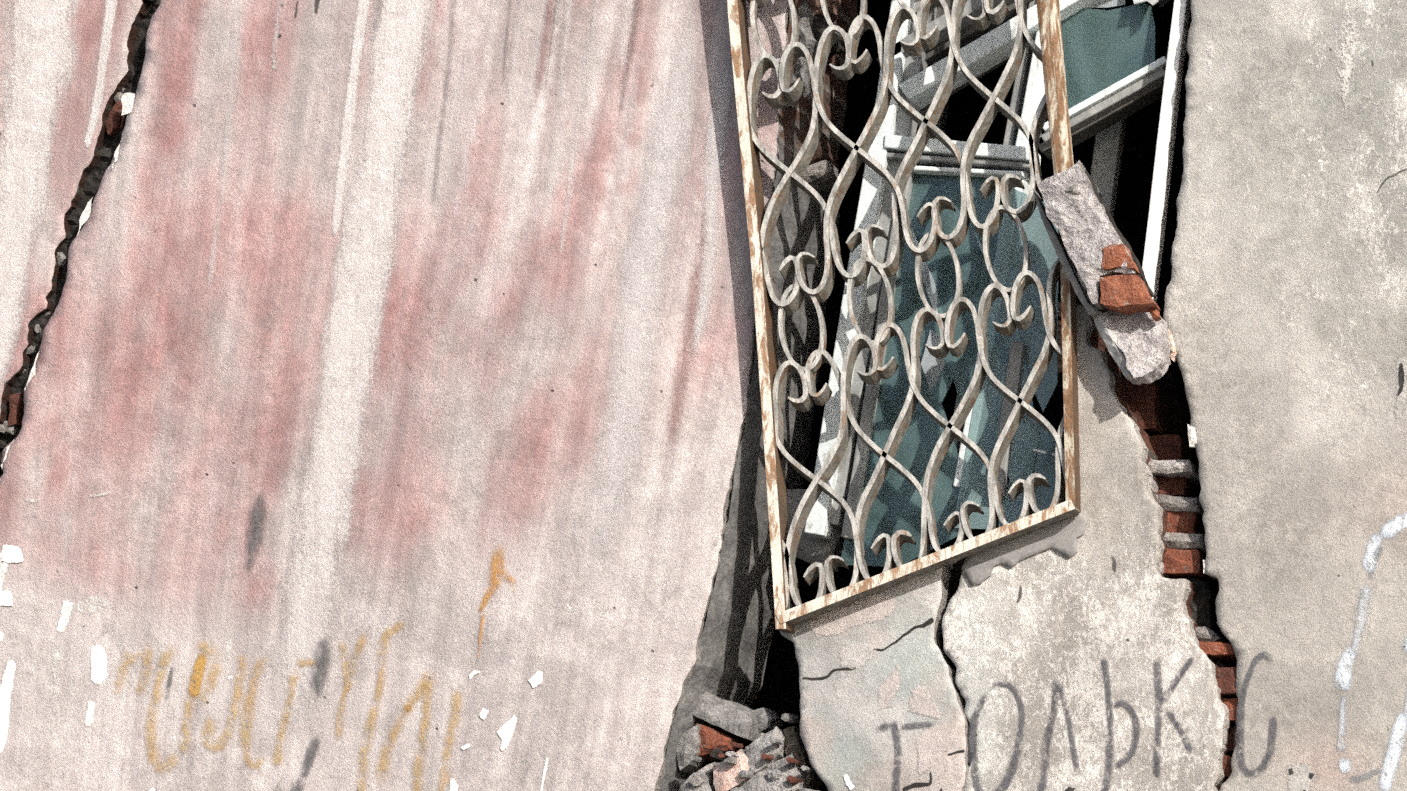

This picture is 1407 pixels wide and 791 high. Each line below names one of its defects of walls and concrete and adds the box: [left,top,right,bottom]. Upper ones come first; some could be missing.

crack [0,0,161,477]
crack [802,550,964,680]
crack [902,750,965,791]